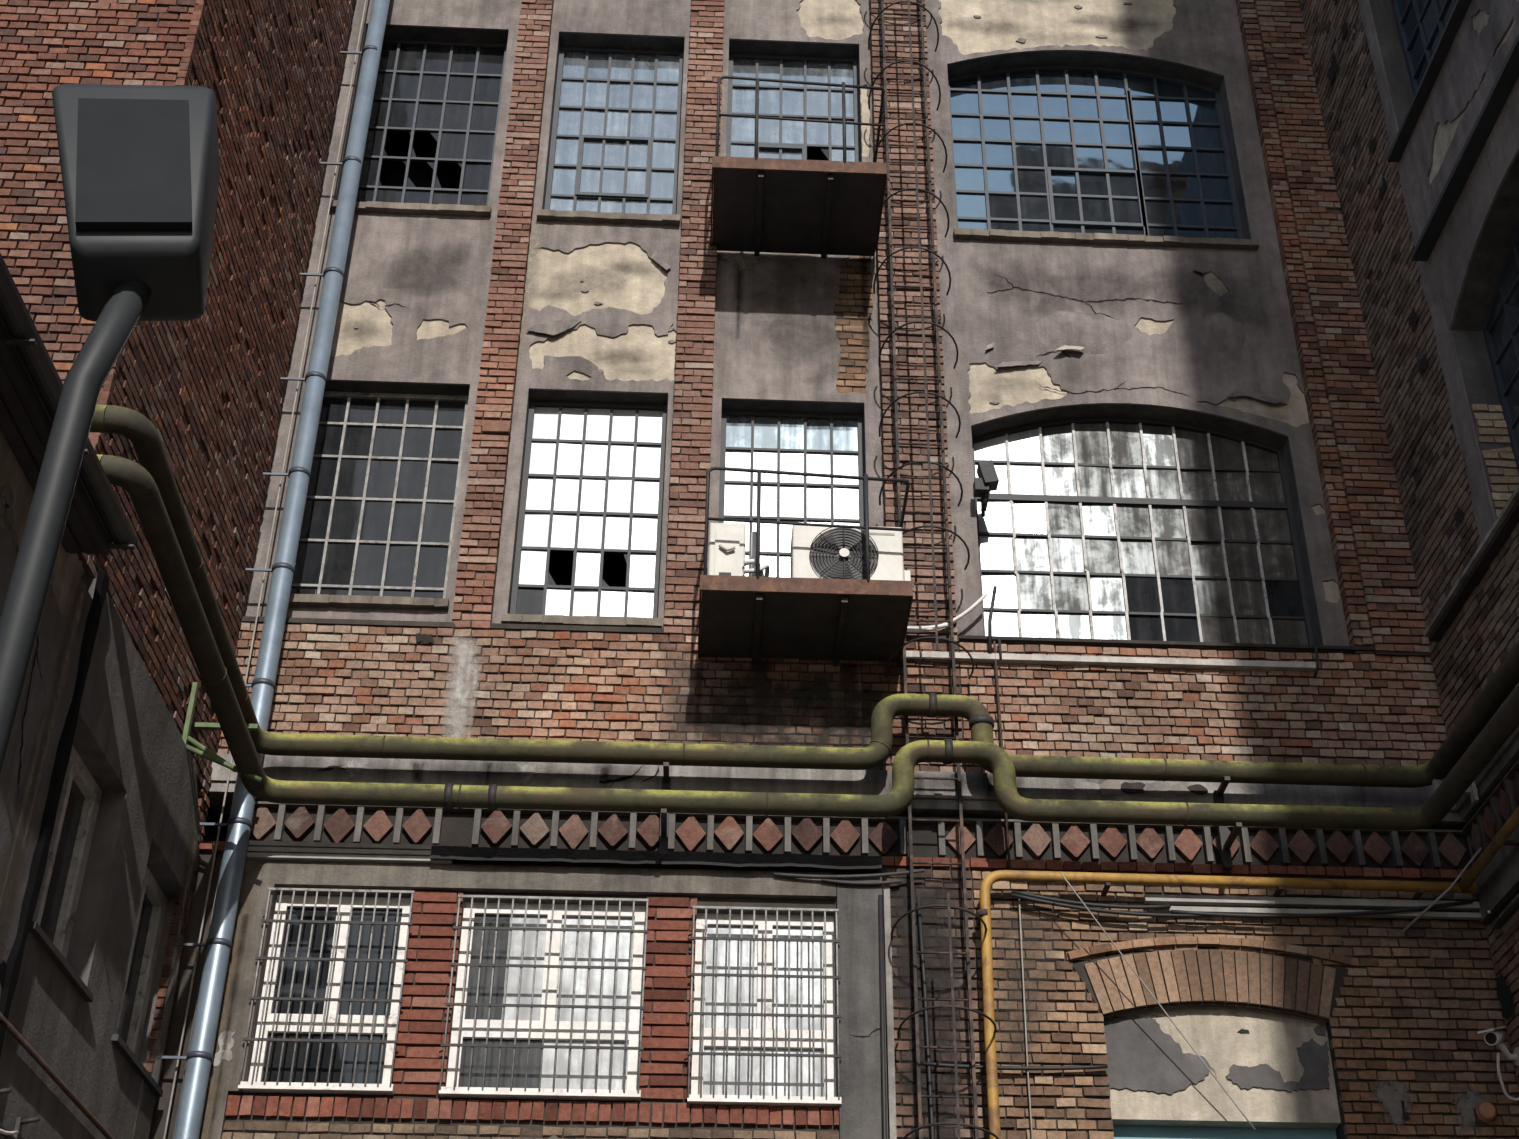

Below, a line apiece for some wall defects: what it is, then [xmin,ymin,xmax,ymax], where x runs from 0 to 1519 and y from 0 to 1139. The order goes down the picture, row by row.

flaking render [797,0,864,40]
flaking render [939,0,1176,55]
flaking render [1429,91,1478,185]
flaking render [331,300,393,357]
flaking render [416,320,467,340]
flaking render [527,243,677,381]
flaking render [833,256,873,393]
crack [987,274,1182,320]
flaking render [968,343,1085,414]
flaking render [1103,1015,1330,1095]